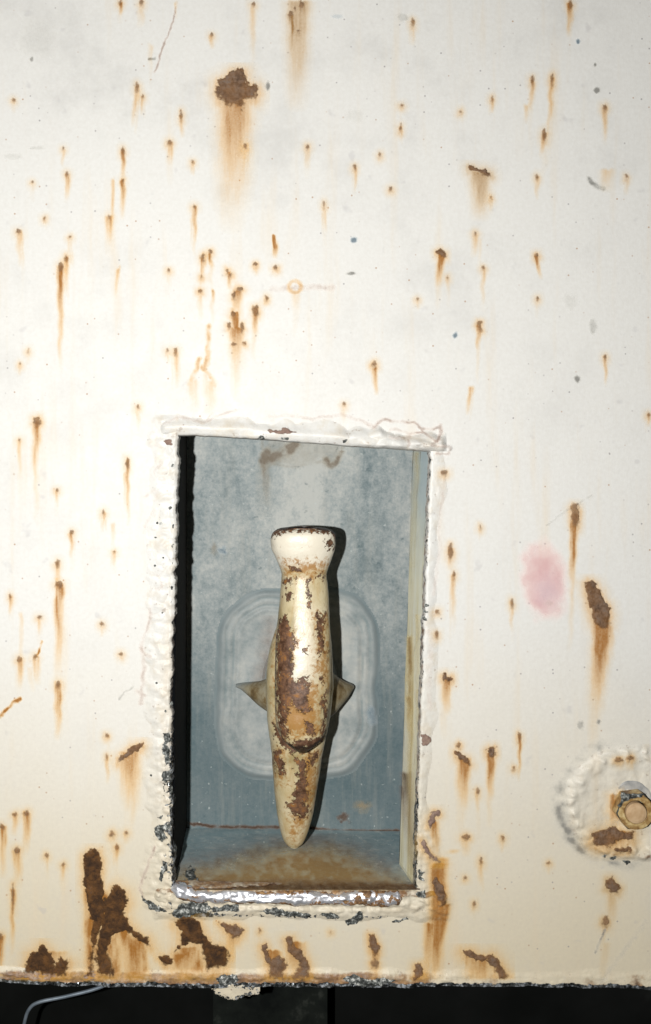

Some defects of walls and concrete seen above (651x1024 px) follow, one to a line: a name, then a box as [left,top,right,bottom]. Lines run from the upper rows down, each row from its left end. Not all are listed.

corrosion [215,68,258,142]
corrosion [228,296,268,345]
corrosion [585,580,611,672]
corrosion [106,743,144,776]
corrosion [454,743,470,783]
corrosion [591,795,634,853]
corrosion [186,810,449,957]
corrosion [82,848,149,976]
corrosion [25,945,68,976]
corrosion [158,916,244,971]
corrosion [262,936,309,979]
corrosion [463,950,507,979]